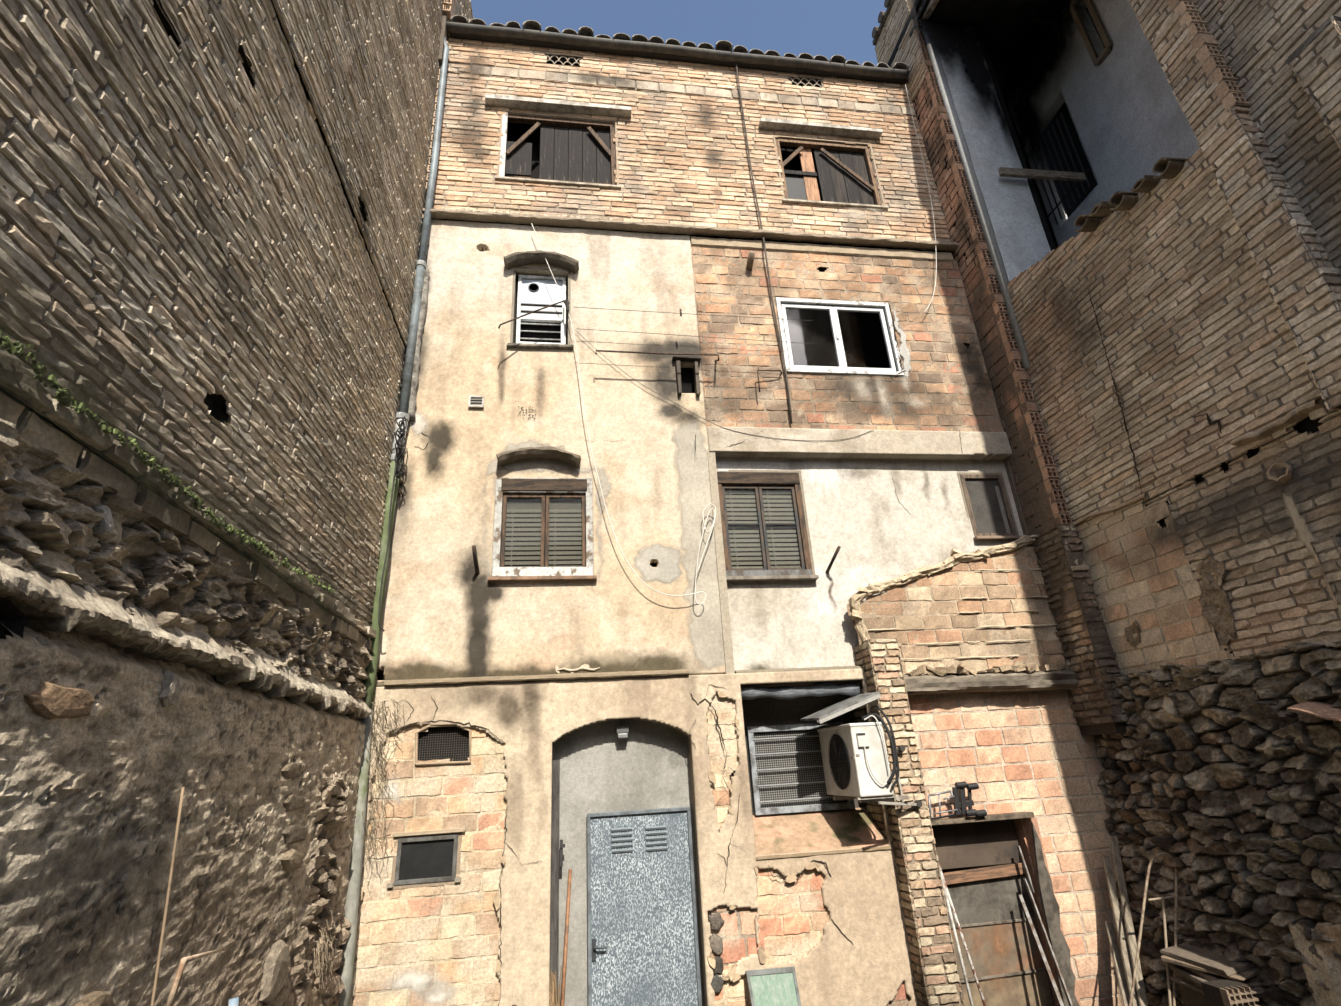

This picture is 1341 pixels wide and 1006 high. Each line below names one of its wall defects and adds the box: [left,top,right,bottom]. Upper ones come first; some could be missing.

damp [427,423,452,473]
damp [376,556,684,723]
crack [689,684,831,893]
spalling [707,862,830,1006]
spalling [887,982,917,1006]